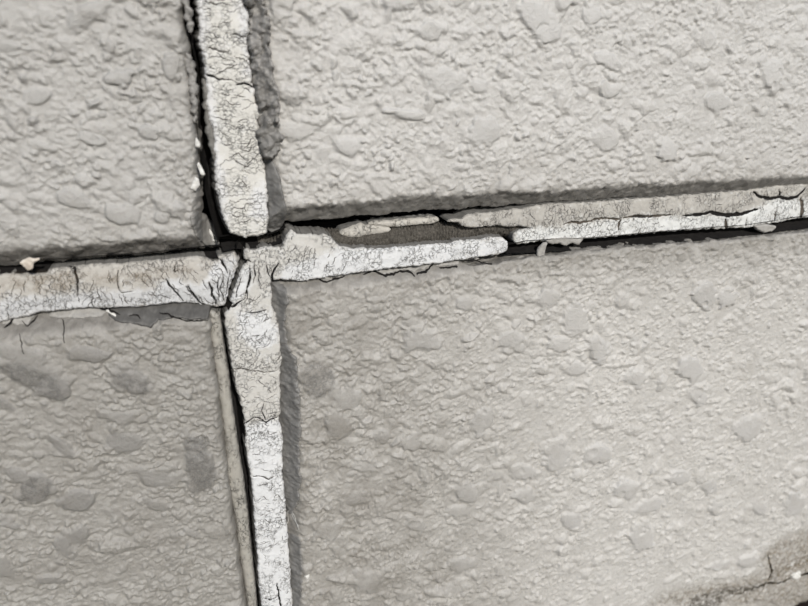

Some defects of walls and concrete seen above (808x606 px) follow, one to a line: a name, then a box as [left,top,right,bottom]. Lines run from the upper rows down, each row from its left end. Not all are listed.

crack [527,187,808,236]
peeling [320,257,479,280]
crack [0,0,492,606]